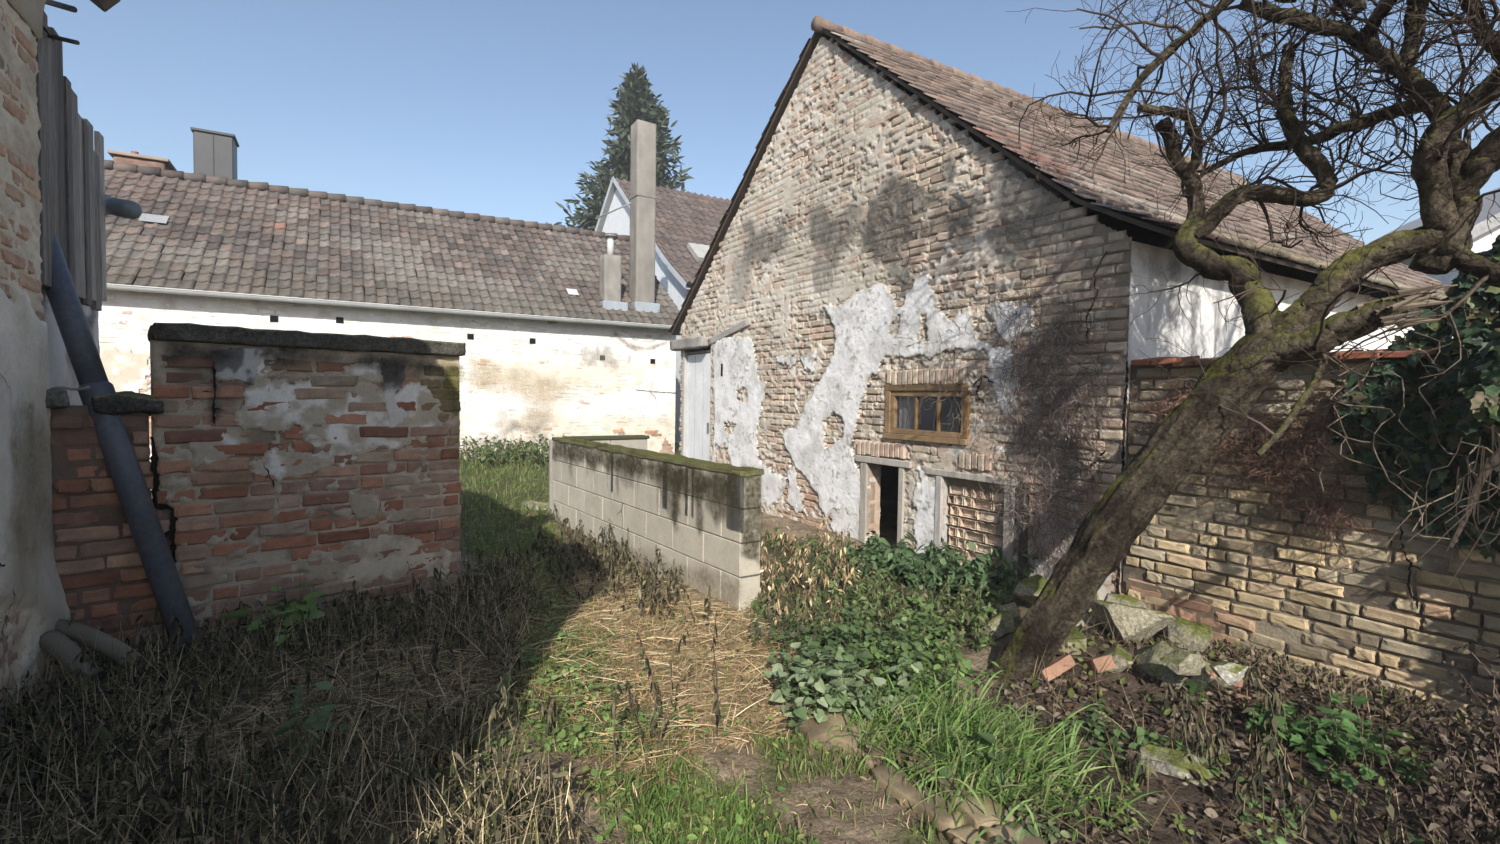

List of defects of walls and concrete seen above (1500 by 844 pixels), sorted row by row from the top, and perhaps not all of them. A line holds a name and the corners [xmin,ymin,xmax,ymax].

water stain [811,166,1088,326]
crack [202,361,222,426]
peeling [186,347,443,483]
peeling [711,273,1042,561]
crack [150,436,178,563]
peeling [282,491,452,596]
peeling [1014,503,1081,580]
spalling [0,611,25,719]